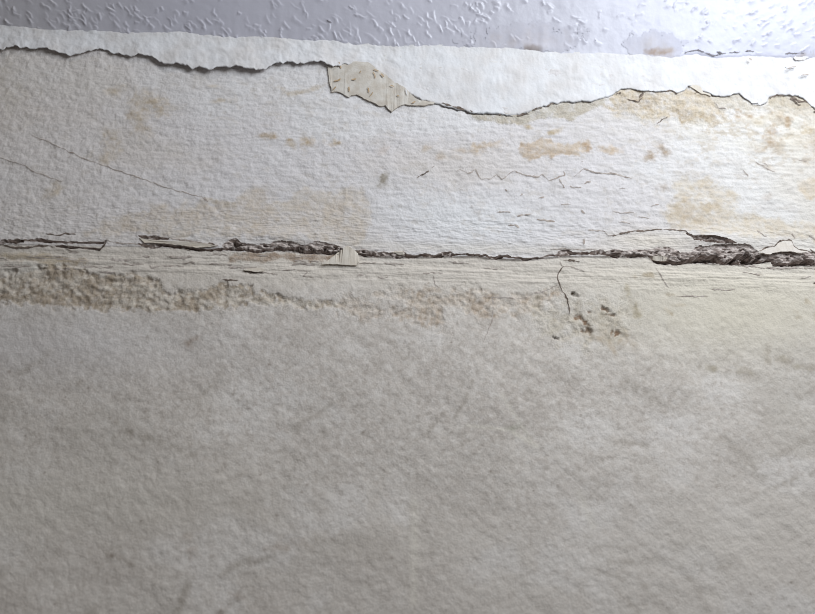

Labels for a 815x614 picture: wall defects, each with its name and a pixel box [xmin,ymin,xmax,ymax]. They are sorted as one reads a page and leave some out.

peeling [0,25,815,133]
crack [34,136,208,202]
crack [0,161,815,335]
leakage [566,270,672,358]